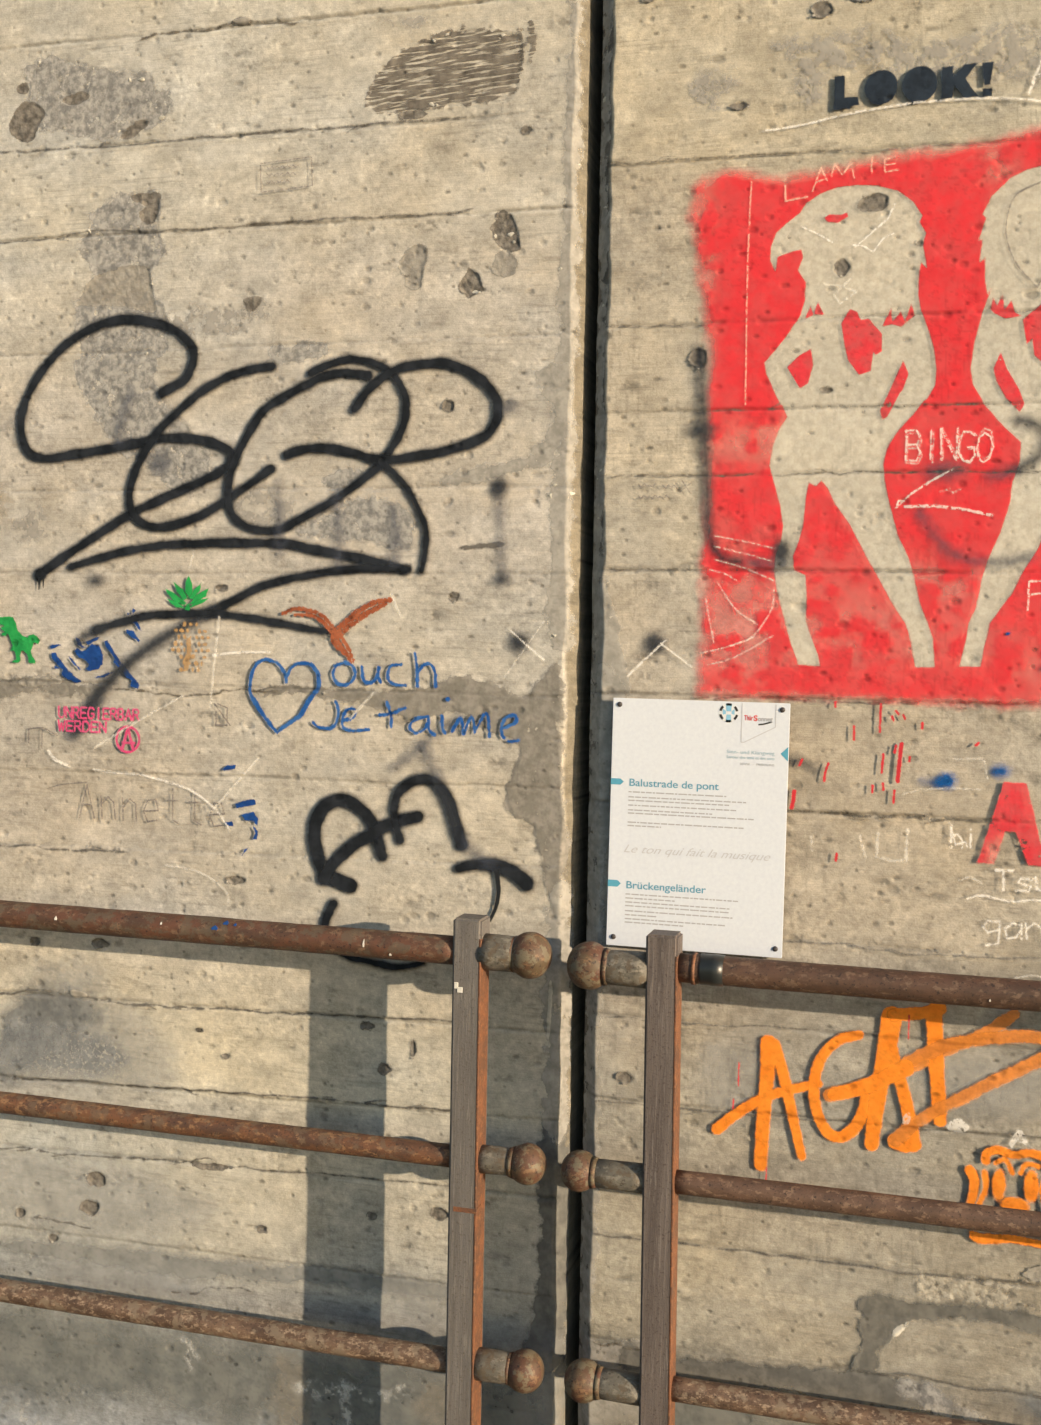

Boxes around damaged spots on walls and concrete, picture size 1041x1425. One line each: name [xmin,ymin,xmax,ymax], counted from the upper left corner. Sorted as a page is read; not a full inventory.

damp [0,985,124,1082]
damp [675,1402,756,1425]